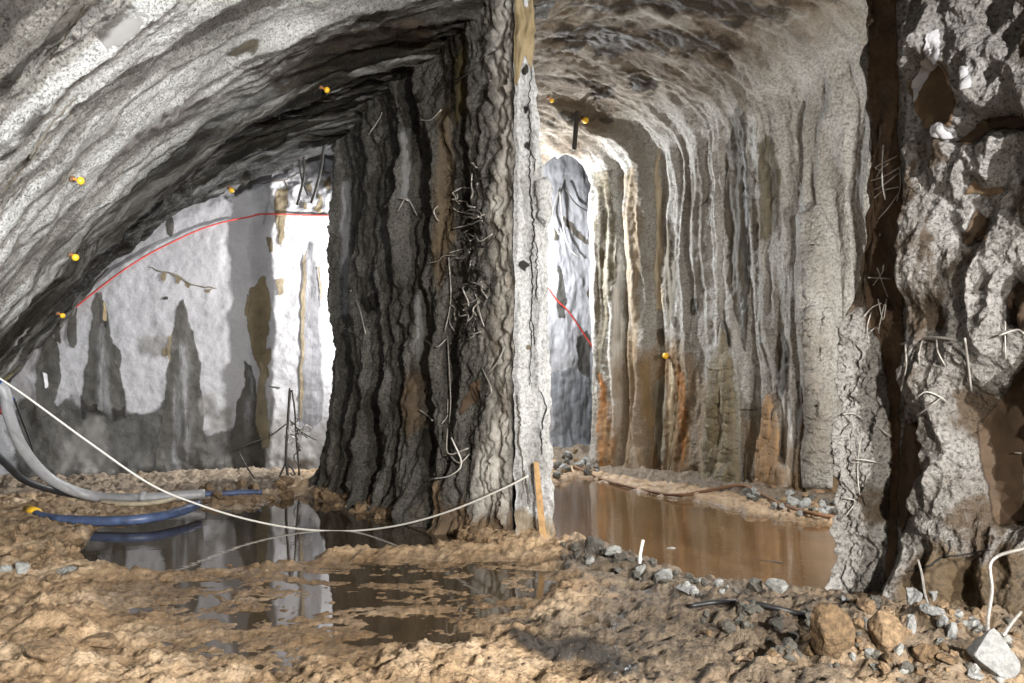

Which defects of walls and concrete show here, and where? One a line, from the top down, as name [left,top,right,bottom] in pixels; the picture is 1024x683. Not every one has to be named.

spalling [907,29,1024,145]
crack [516,67,547,505]
leakage [14,242,324,478]
corrosion [596,373,616,467]
corrosion [639,346,699,473]